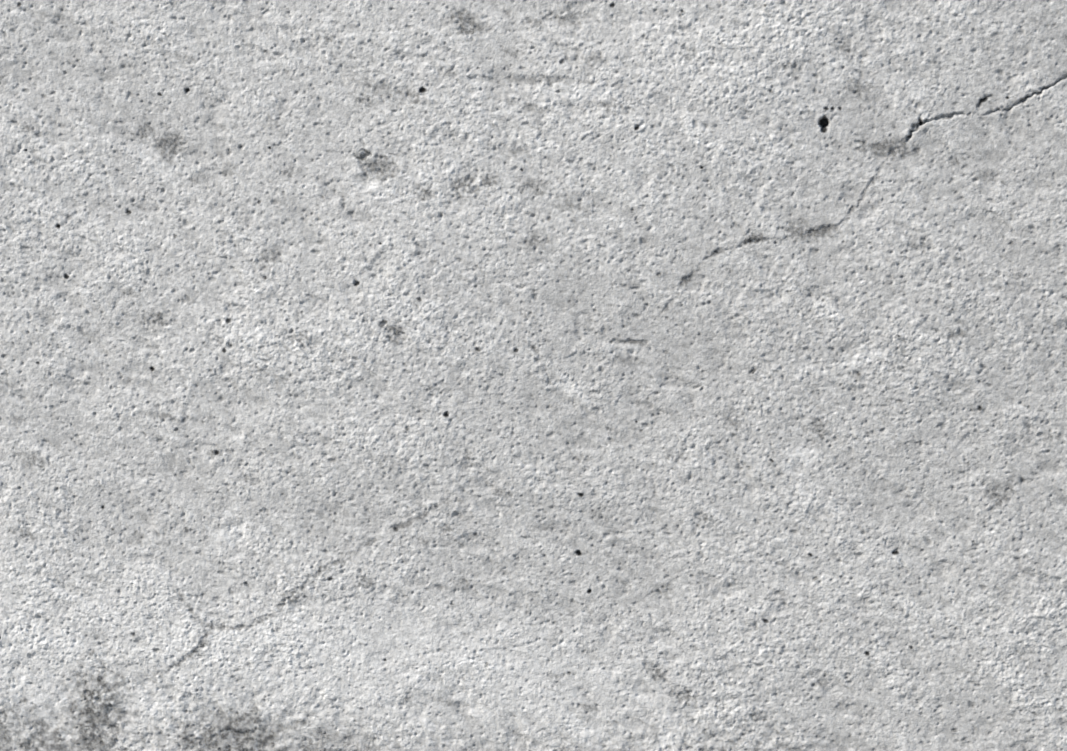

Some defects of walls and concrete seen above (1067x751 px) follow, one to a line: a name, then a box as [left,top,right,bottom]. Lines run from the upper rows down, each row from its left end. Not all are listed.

crack [861,114,953,182]
crack [745,234,763,242]
crack [788,223,831,238]